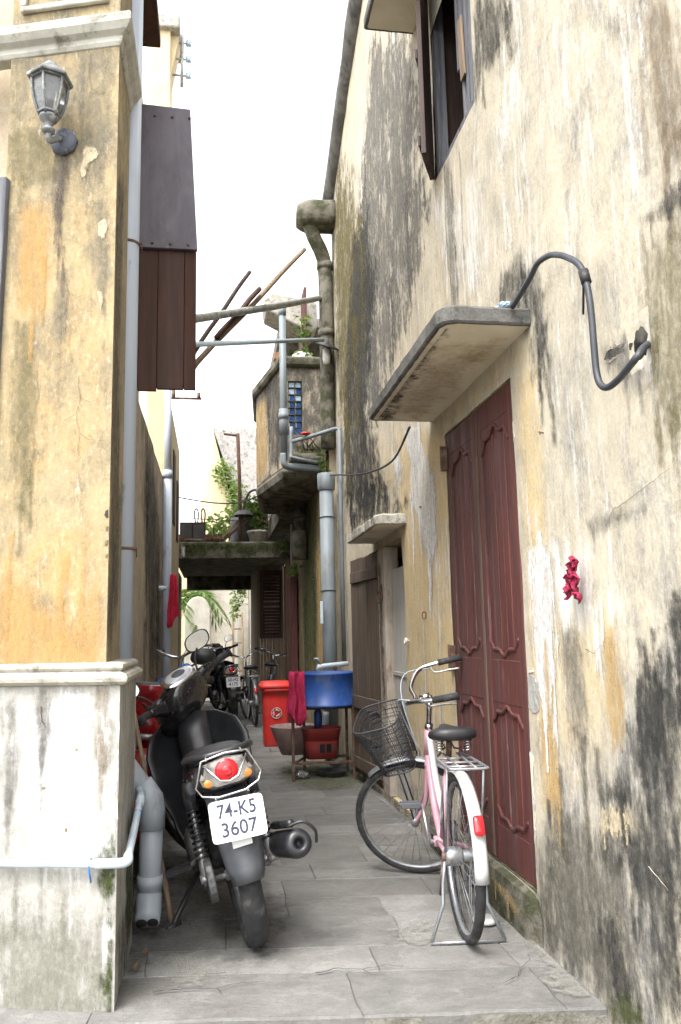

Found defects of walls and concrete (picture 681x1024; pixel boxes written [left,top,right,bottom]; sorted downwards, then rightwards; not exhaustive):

peeling [80,147,98,177]
peeling [98,219,107,238]
leakage [343,32,447,530]
leakage [36,691,50,775]
leakage [5,742,14,825]
leakage [539,592,681,1018]
leakage [0,891,131,1012]